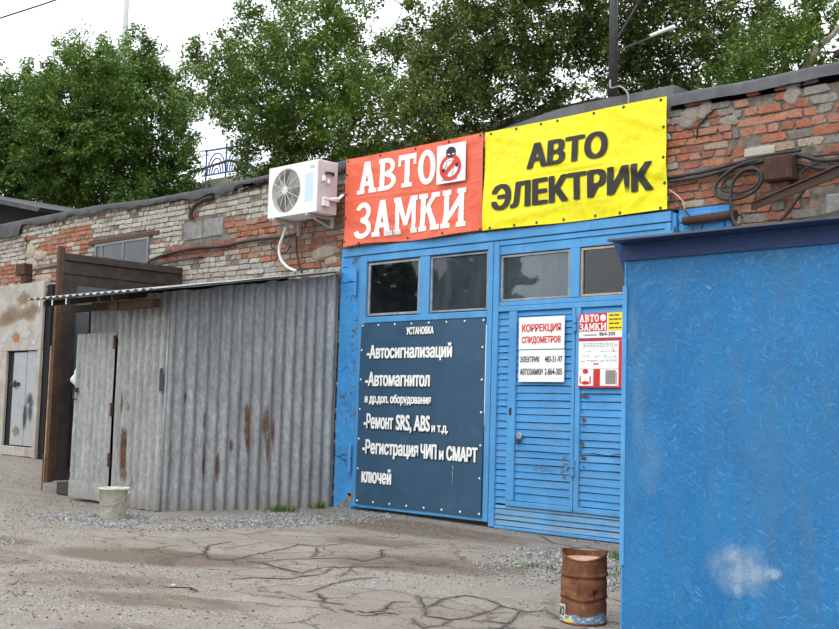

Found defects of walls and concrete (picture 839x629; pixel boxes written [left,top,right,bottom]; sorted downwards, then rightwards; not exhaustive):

corrosion [119,429,132,484]
corrosion [263,409,274,459]